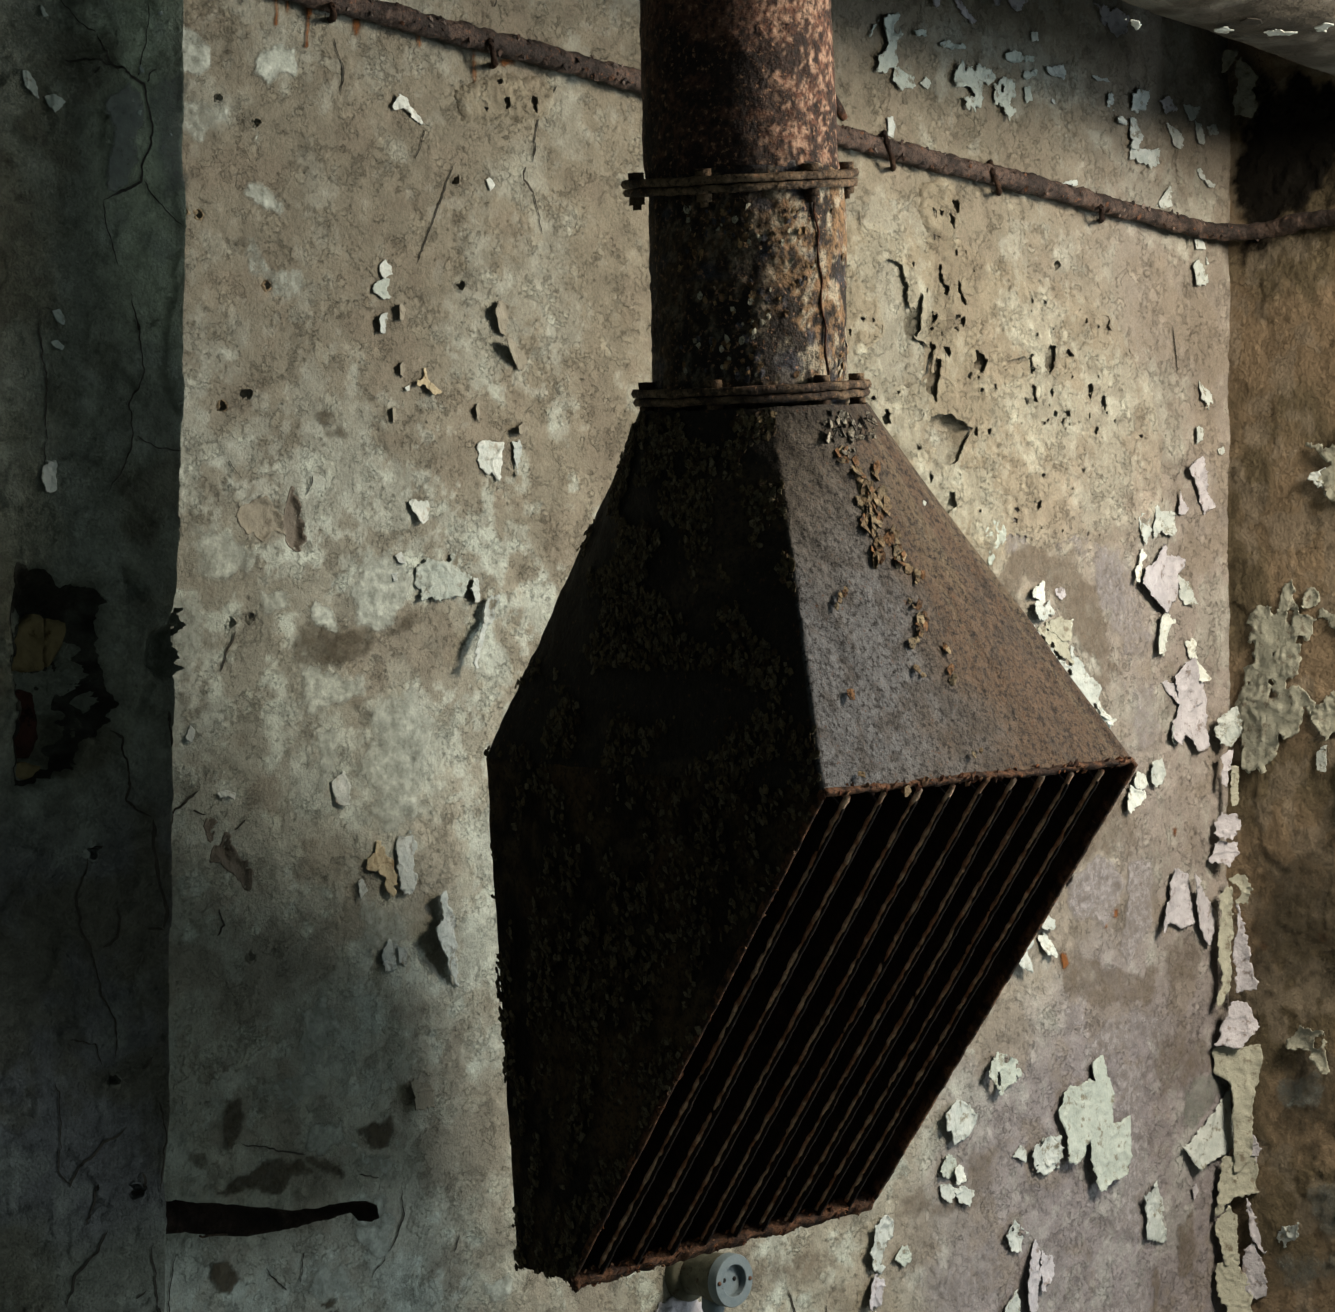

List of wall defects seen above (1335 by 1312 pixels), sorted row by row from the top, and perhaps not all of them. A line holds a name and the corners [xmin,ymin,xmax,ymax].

crack [61,0,181,264]
peeling [869,12,1066,121]
water stain [1232,72,1335,267]
peeling [1135,426,1225,656]
crack [158,711,173,747]
peeling [1032,581,1117,728]
peeling [1127,758,1166,814]
crack [72,730,206,1069]
peeling [1161,579,1335,1312]
crack [55,1085,168,1307]
crack [136,1248,176,1312]
peeling [1012,1055,1133,1192]